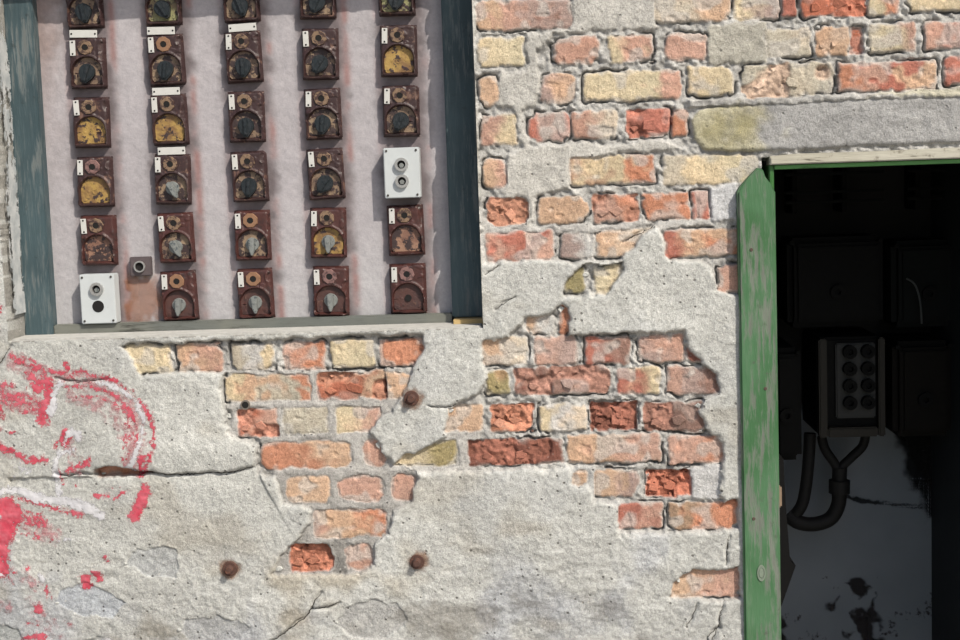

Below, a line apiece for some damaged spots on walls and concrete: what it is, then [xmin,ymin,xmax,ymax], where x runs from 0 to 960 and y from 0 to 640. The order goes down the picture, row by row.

spalling [742,0,867,99]
spalling [626,108,673,139]
spalling [485,197,530,227]
spalling [592,194,641,225]
flaking render [123,262,741,580]
crack [152,463,259,476]
flaking render [670,567,742,603]
crack [274,593,336,640]